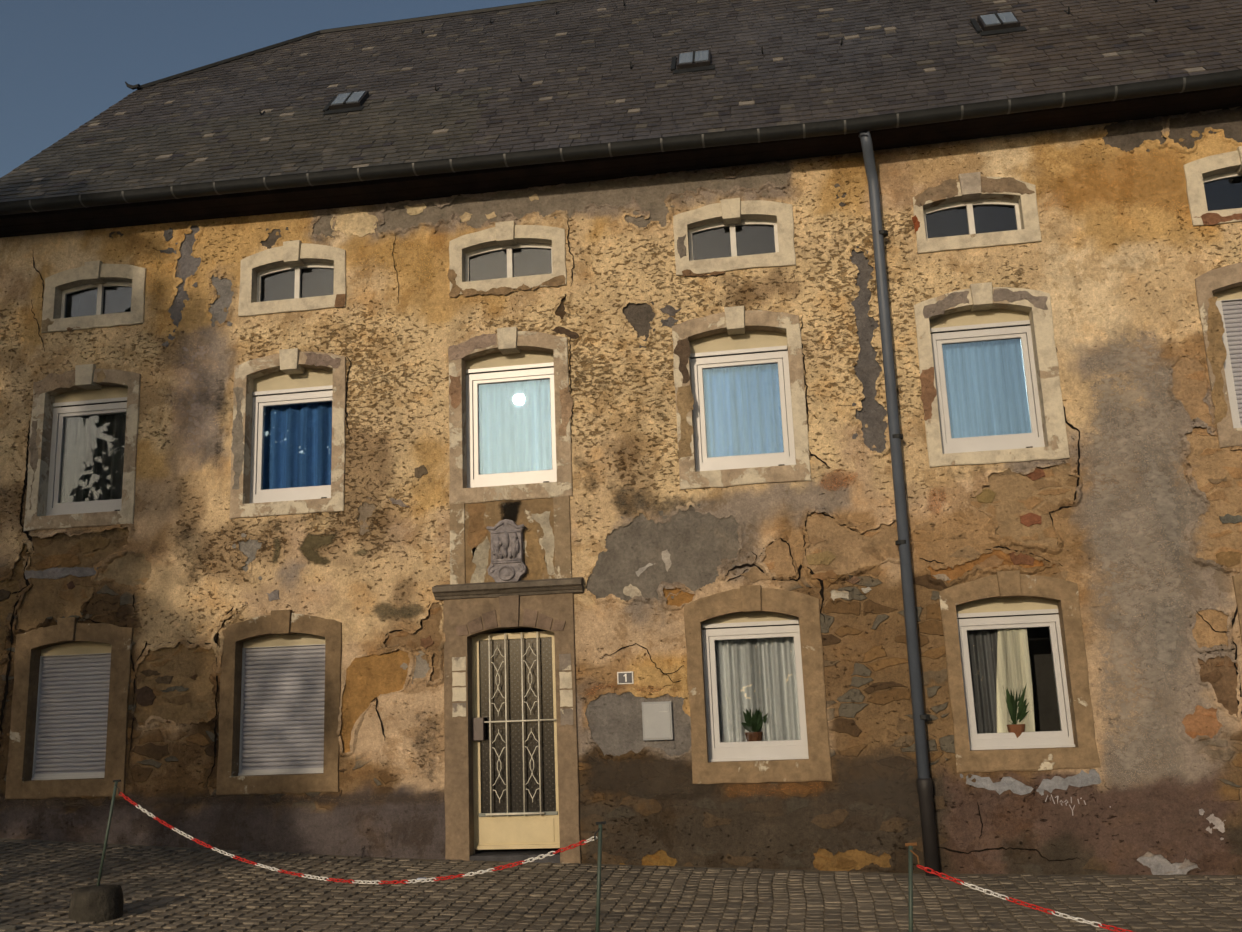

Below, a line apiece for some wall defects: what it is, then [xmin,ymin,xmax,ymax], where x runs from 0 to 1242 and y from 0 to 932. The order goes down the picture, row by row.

flaking render [1101,106,1242,155]
crack [31,257,45,352]
flaking render [160,221,239,347]
flaking render [617,298,694,460]
flaking render [847,246,891,458]
crack [0,421,34,747]
crack [725,512,860,622]
flaking render [582,462,1083,612]
leakage [1085,334,1201,775]
spalling [337,599,446,757]